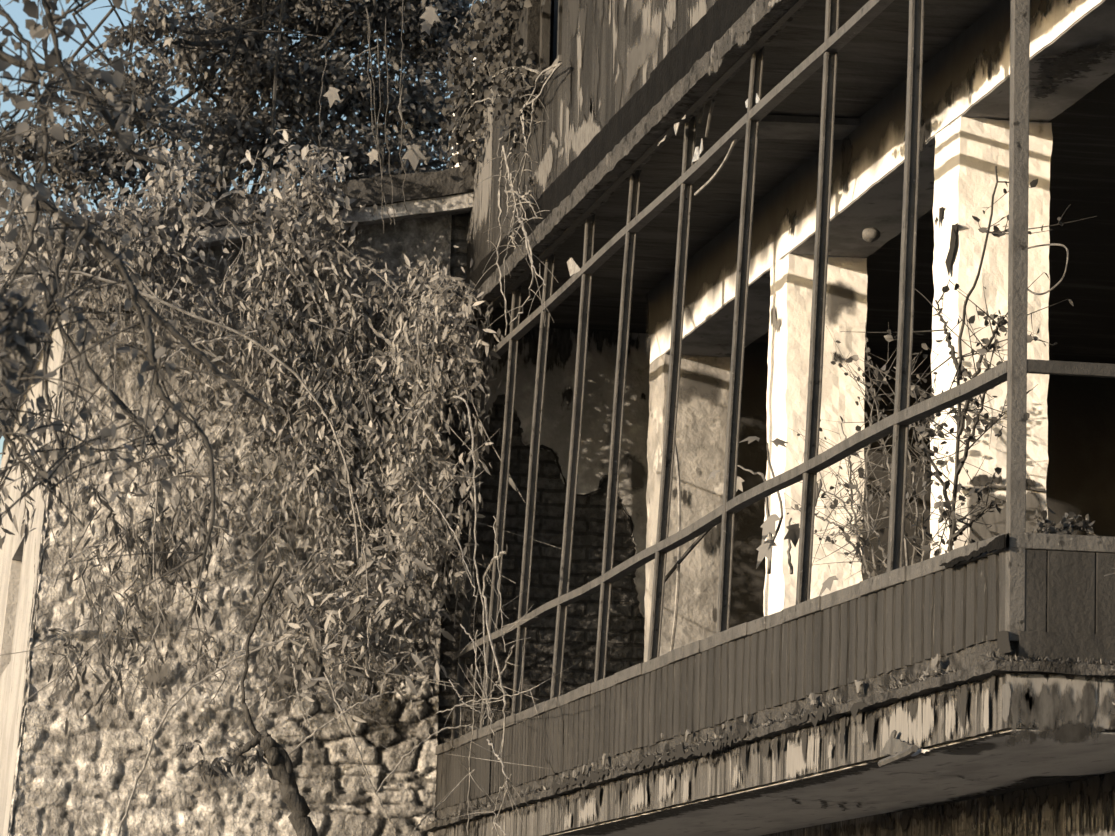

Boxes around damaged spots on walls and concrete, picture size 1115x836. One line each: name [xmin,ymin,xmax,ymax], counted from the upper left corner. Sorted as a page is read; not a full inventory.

peeling [665,0,676,32]
damp [1030,0,1071,34]
damp [737,31,751,47]
damp [920,0,1011,152]
peeling [528,93,602,189]
damp [467,0,716,245]
damp [491,79,907,372]
damp [678,369,721,403]
damp [625,454,646,491]
spalling [475,445,642,690]
spalling [931,654,941,671]
spalling [562,754,606,779]